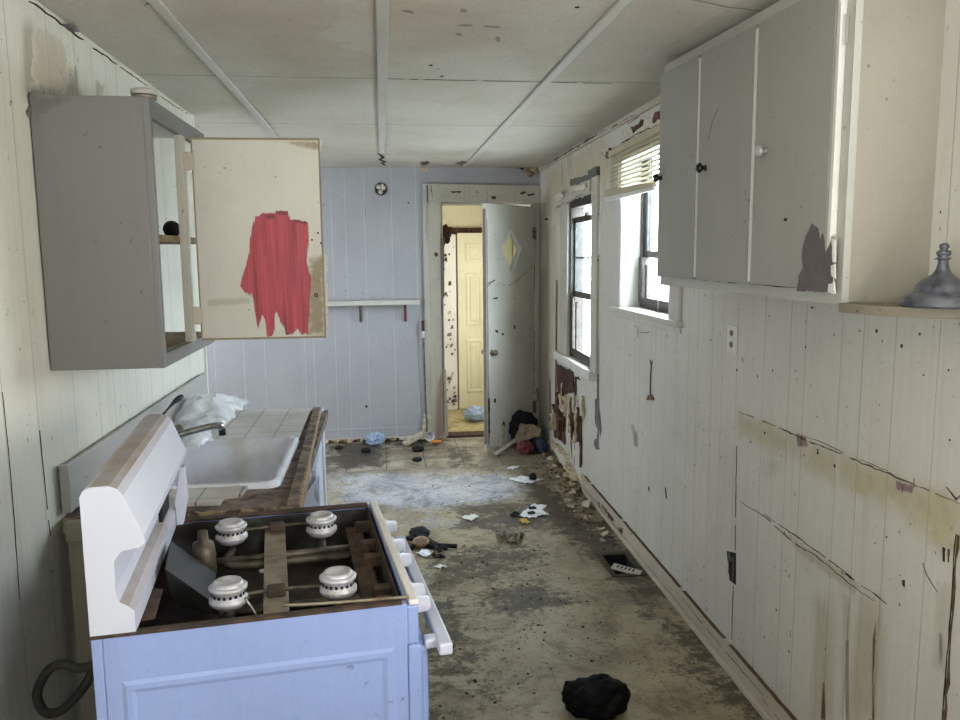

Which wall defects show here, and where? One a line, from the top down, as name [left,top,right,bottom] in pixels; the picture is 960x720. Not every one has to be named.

spalling [542,392,632,542]
crack [735,446,886,604]
damp [731,404,960,678]
crack [736,411,960,504]
crack [922,534,960,720]